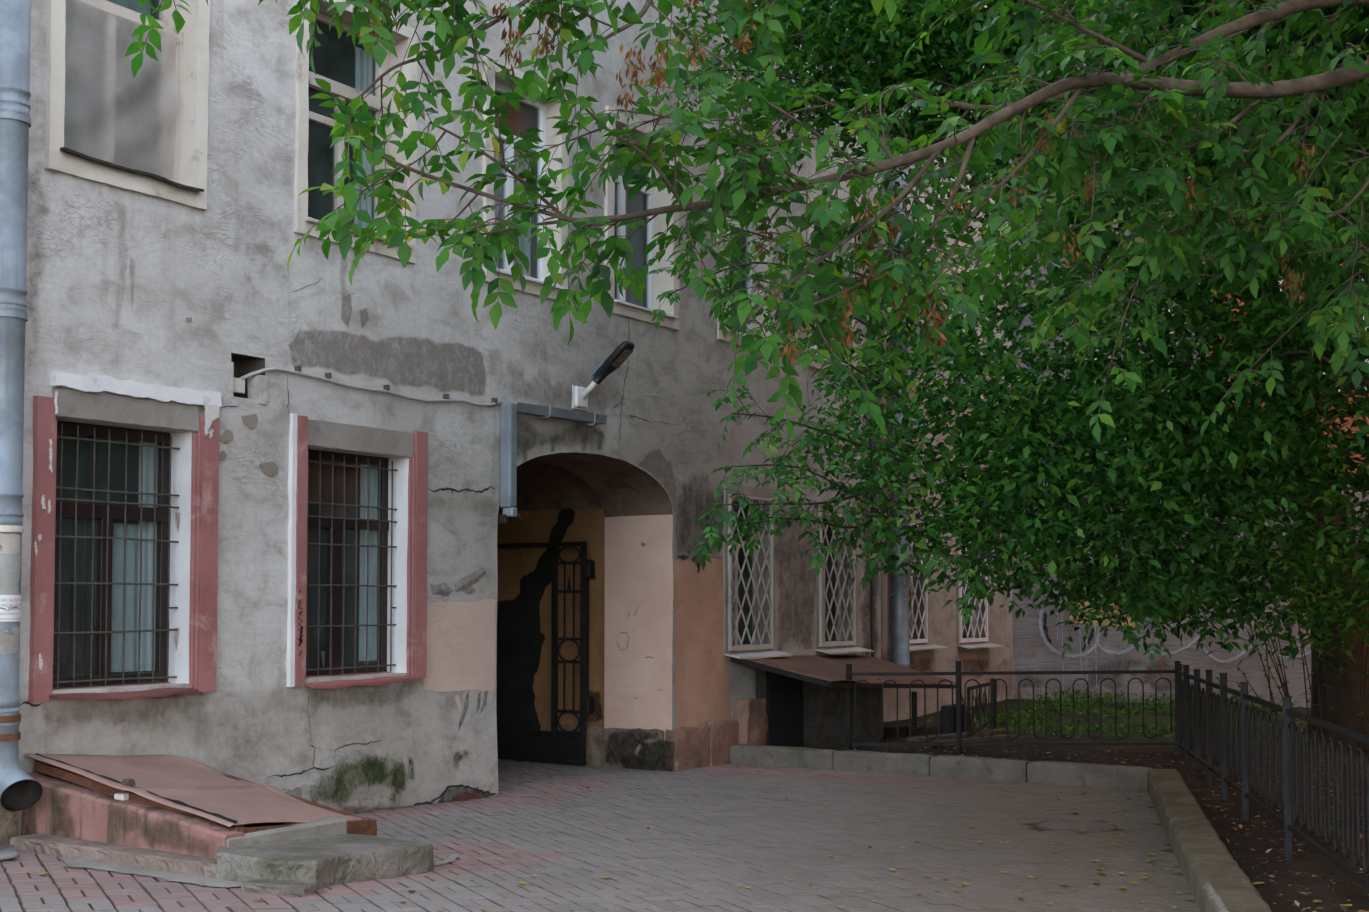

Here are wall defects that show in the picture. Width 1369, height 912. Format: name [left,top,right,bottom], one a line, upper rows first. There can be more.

spalling [203,353,268,460]
peeling [259,462,279,477]
crack [428,486,495,495]
crack [268,696,381,778]